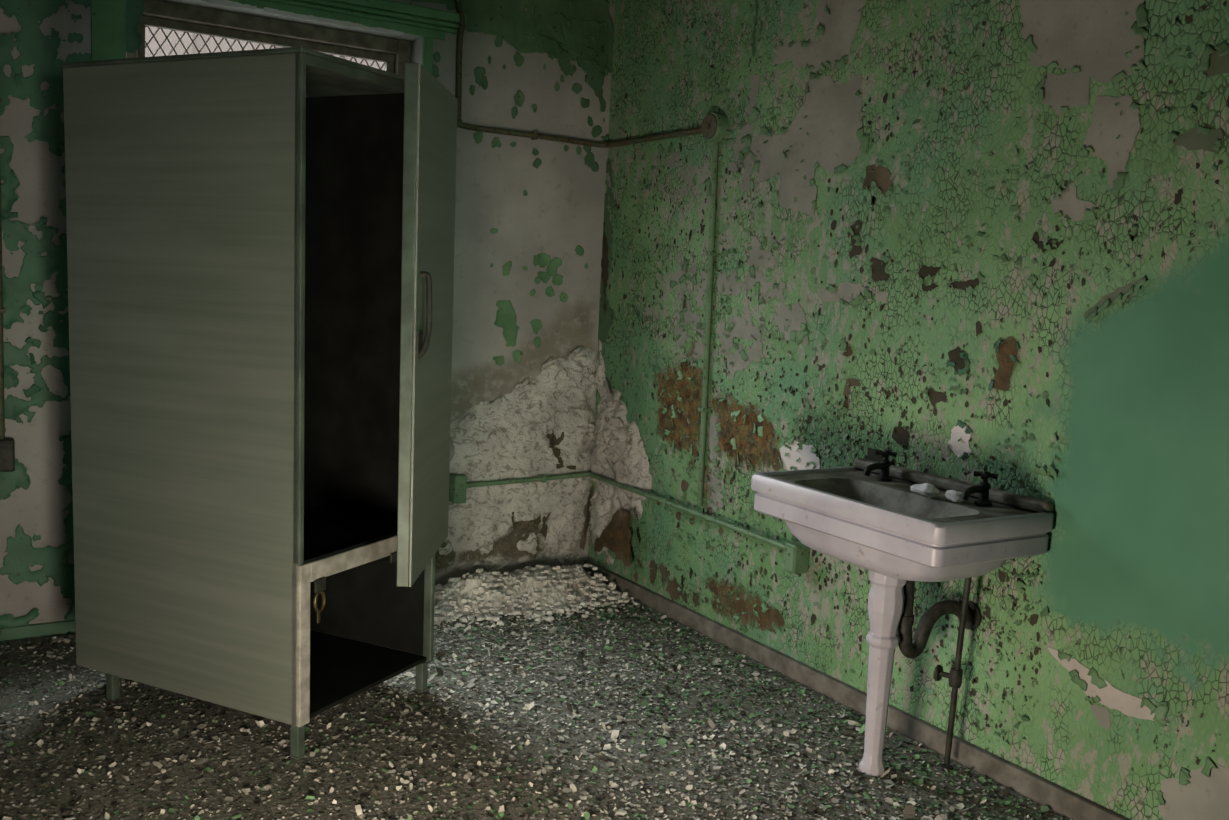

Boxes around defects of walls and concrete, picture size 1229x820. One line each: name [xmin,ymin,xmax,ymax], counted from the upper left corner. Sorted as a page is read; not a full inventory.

peeling [126,0,145,54]
peeling [1167,5,1229,79]
peeling [1166,93,1229,184]
peeling [0,0,91,432]
peeling [0,431,75,621]
damp [435,512,541,571]
peeling [0,608,39,628]
peeling [910,557,1169,744]